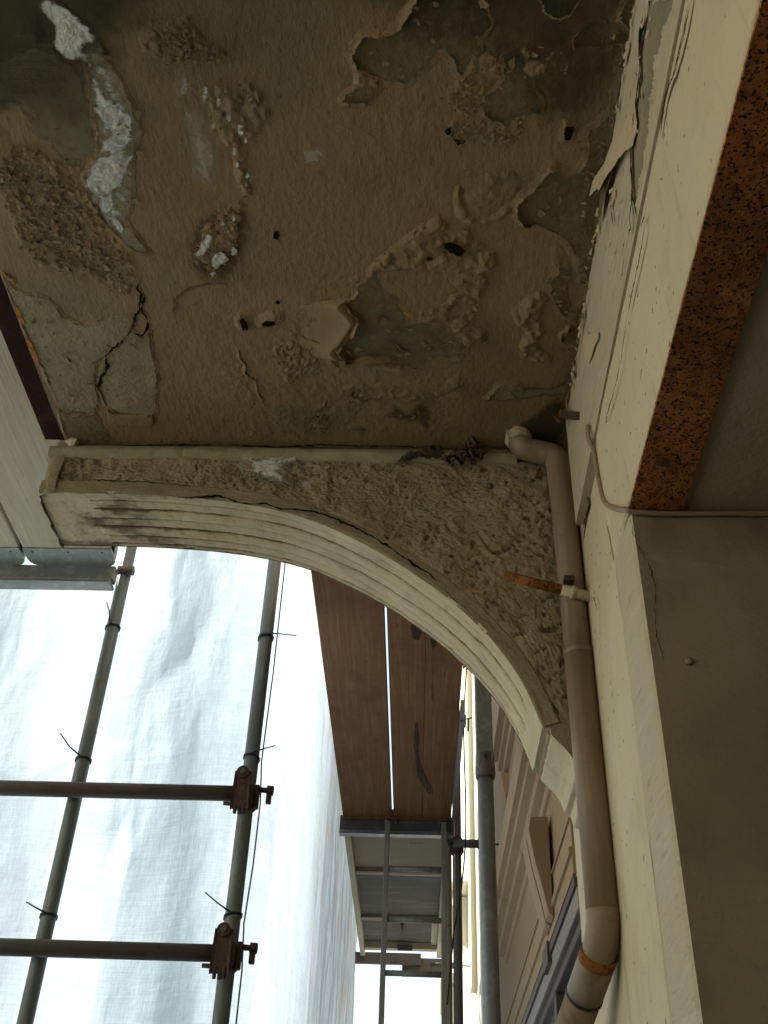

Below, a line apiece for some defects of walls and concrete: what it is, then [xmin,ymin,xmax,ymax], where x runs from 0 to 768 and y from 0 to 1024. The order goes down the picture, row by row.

water stain [0,0,133,233]
peeling [0,41,156,296]
peeling [344,0,496,90]
peeling [470,42,548,126]
peeling [508,0,676,404]
peeling [0,271,163,443]
crack [97,275,160,400]
peeling [334,254,471,377]